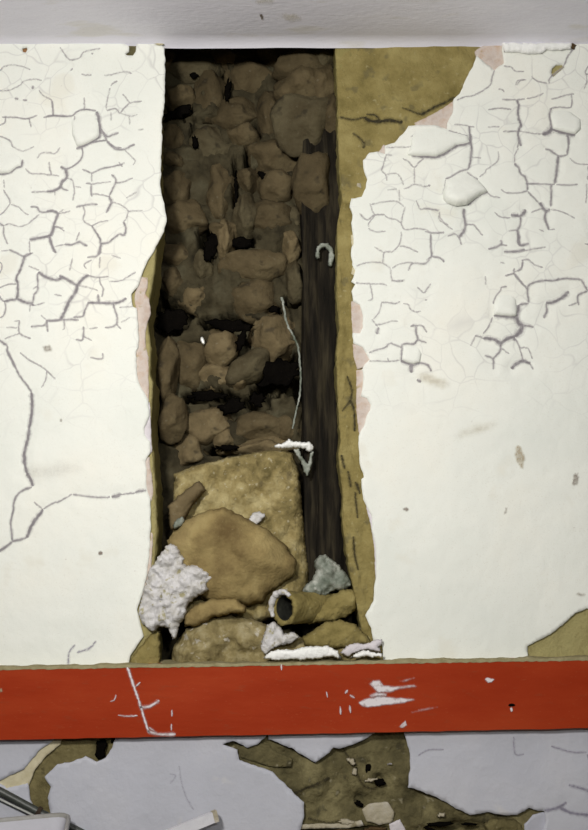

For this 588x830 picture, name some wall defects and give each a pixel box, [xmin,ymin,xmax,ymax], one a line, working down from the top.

crack [340,49,588,382]
crack [0,65,146,551]
flaking render [264,46,504,661]
flaking render [129,239,161,662]
flaking render [249,511,266,525]
flaking render [527,608,588,657]
flaking render [0,738,115,813]
flaking render [224,732,545,830]
crack [544,785,588,816]